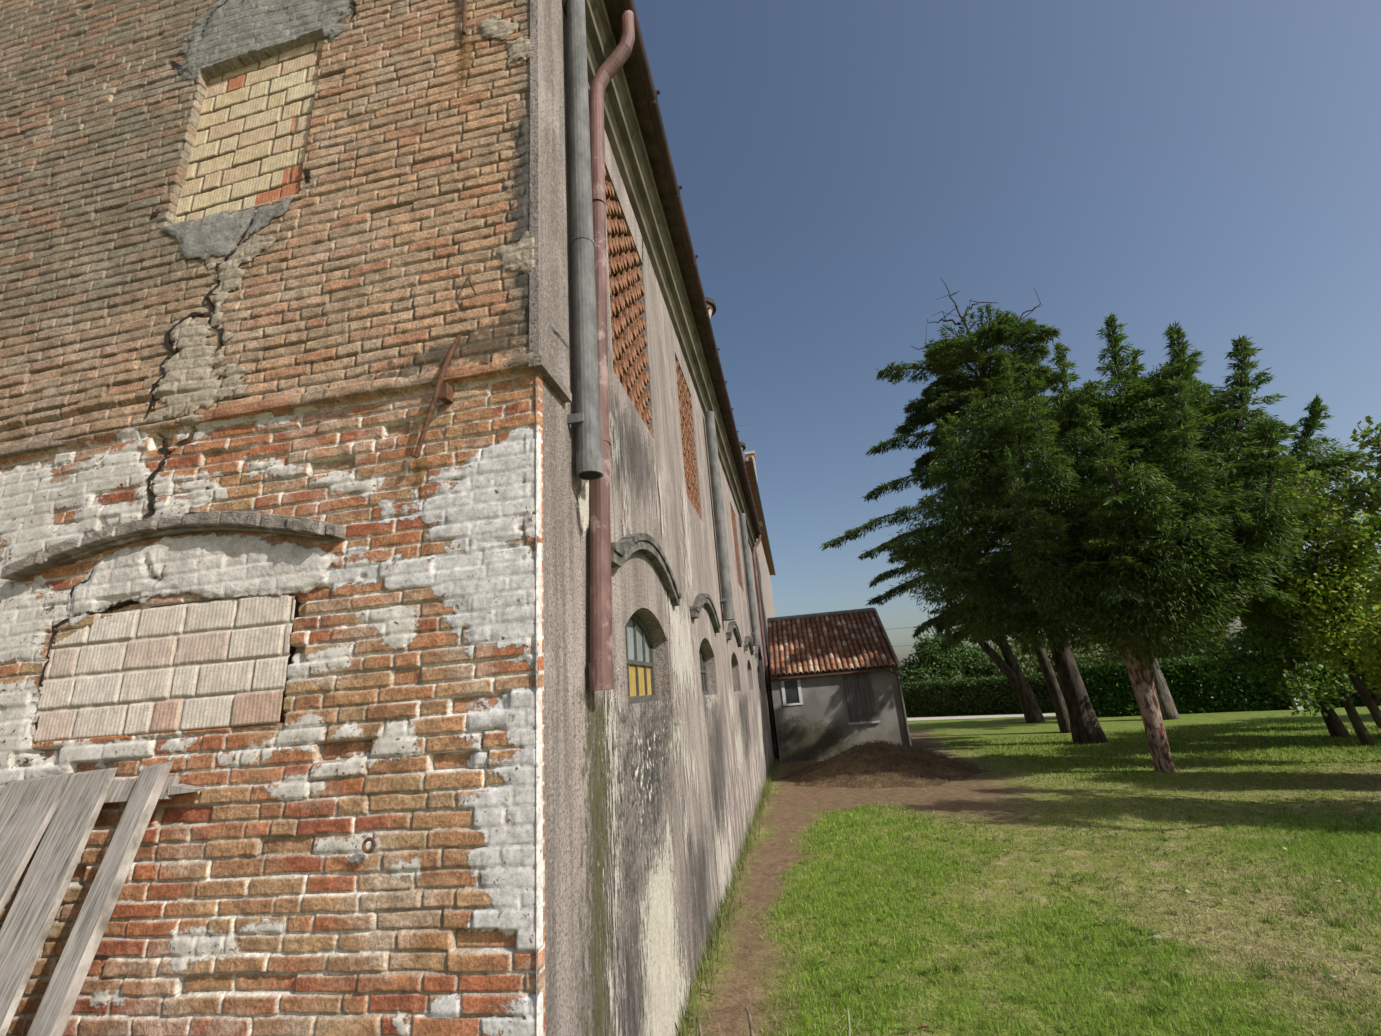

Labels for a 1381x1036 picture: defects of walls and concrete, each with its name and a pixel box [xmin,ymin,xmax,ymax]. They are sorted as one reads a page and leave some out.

crack [143,210,256,519]
peeling [0,405,542,787]
peeling [214,712,425,802]
water stain [574,410,764,1036]
peeling [310,831,423,883]
peeling [459,687,543,950]
peeling [168,918,288,973]
peeling [89,988,125,1009]
peeling [387,991,543,1036]